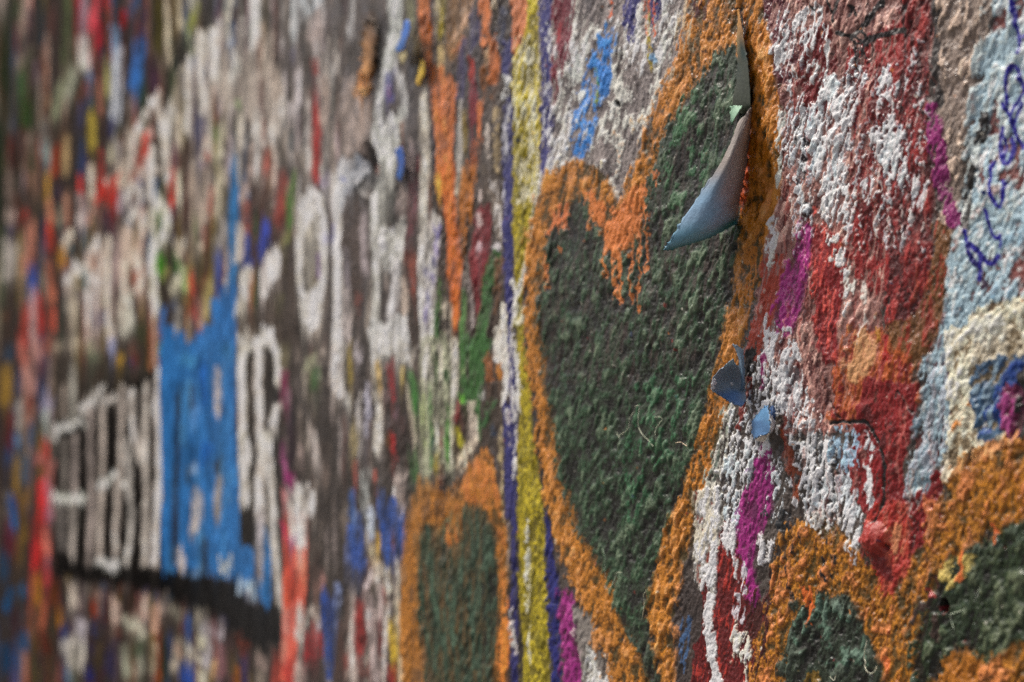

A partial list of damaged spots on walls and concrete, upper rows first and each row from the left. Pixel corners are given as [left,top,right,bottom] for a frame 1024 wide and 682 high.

peeling [664,9,752,251]
peeling [711,344,757,407]
peeling [751,405,776,442]